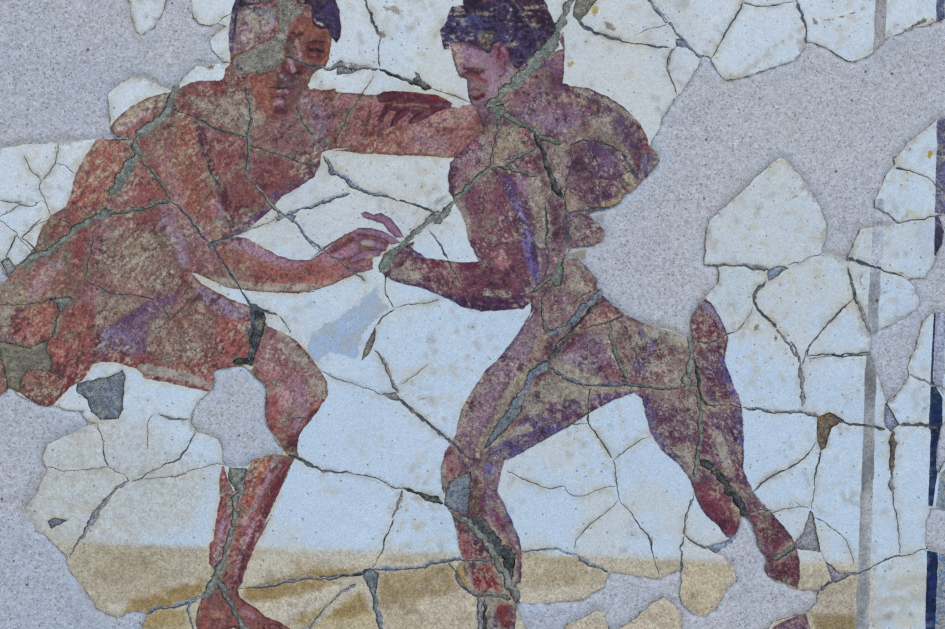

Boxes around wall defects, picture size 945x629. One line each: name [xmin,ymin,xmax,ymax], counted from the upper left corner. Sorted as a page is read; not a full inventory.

crack [0,0,807,360]
crack [896,167,945,192]
spalling [0,230,70,277]
spalling [755,266,788,281]
spalling [0,296,73,391]
spalling [76,370,126,435]
crack [147,205,945,629]
spalling [873,312,940,432]
spalling [48,518,67,529]
crack [50,422,223,556]
spalling [706,534,736,553]
spalling [743,492,864,629]